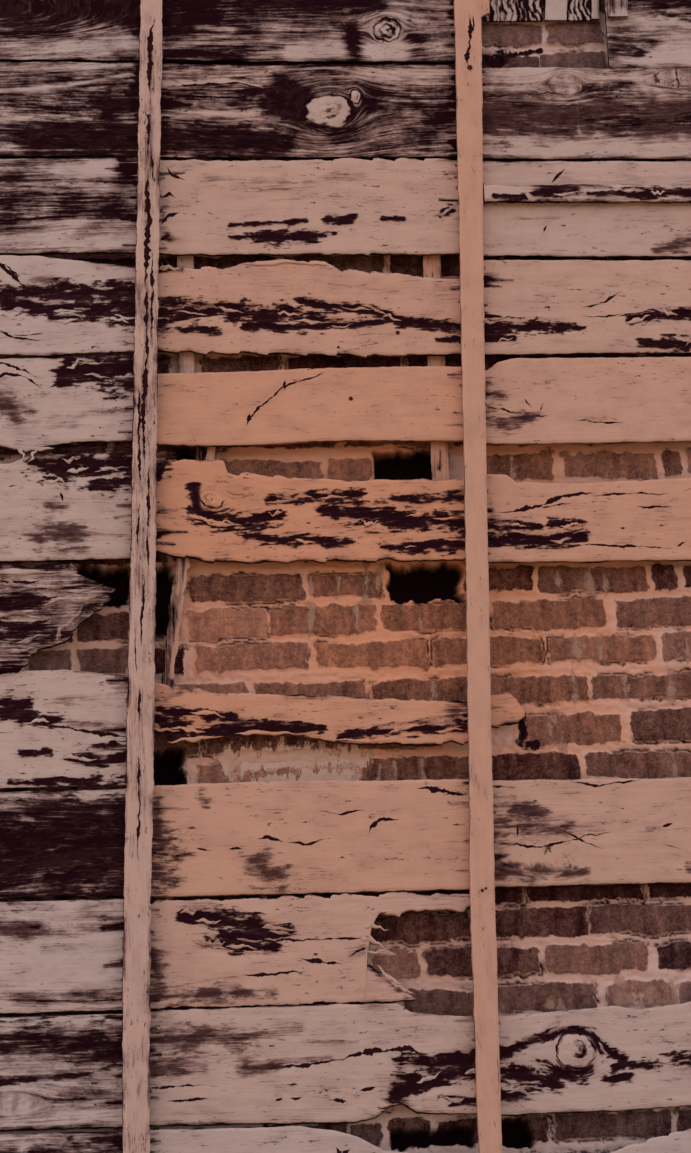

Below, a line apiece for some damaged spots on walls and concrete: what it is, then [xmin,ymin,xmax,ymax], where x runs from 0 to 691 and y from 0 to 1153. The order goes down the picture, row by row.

peeling [491,193,529,201]
peeling [555,185,691,200]
crack [0,24,331,854]
peeling [266,494,347,517]
peeling [406,491,460,520]
peeling [188,514,242,527]
peeling [0,568,103,655]
peeling [154,710,224,733]
peeling [329,725,421,743]
spalling [516,713,540,751]
spalling [358,935,415,1004]
peeling [417,1068,476,1083]